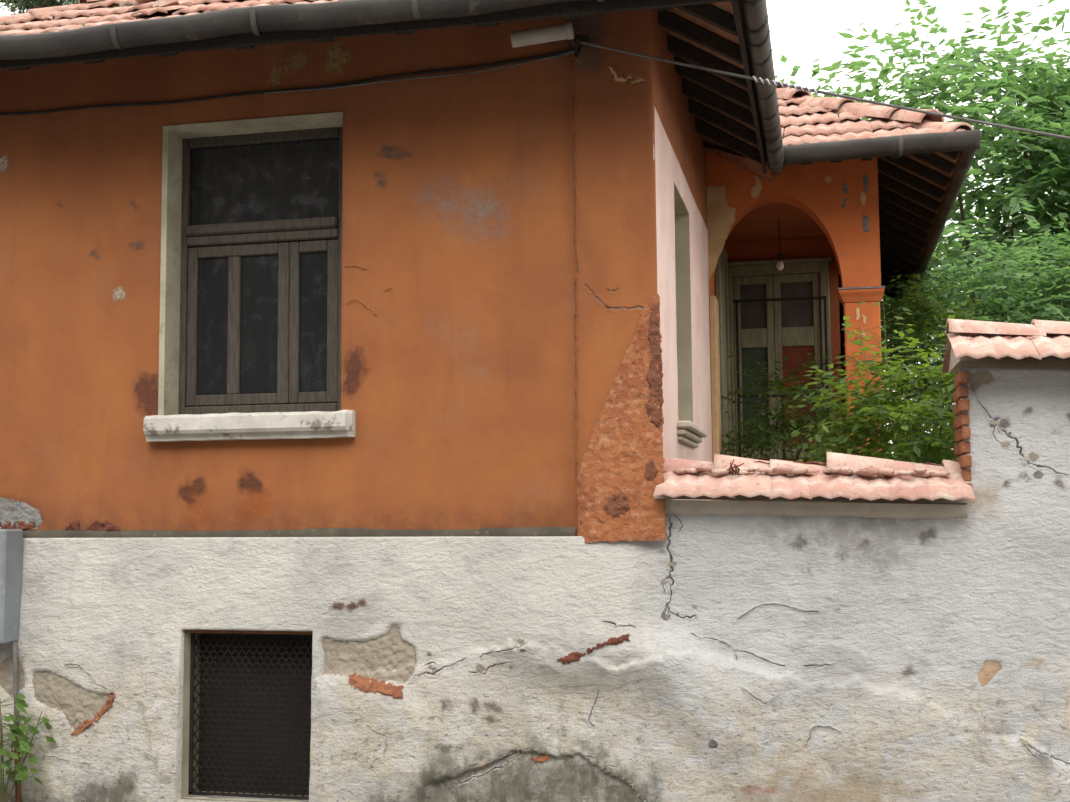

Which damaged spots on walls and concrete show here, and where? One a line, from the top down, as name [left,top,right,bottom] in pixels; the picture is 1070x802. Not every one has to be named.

peeling [707,186,736,279]
spalling [576,294,666,543]
crack [967,382,1067,481]
corrosion [180,477,204,503]
corrosion [239,473,262,491]
crack [603,513,841,670]
spalling [0,655,115,736]
peeling [322,624,417,699]
crack [413,639,529,680]
water stain [470,699,501,722]
crack [804,723,842,747]
water stain [415,746,658,802]